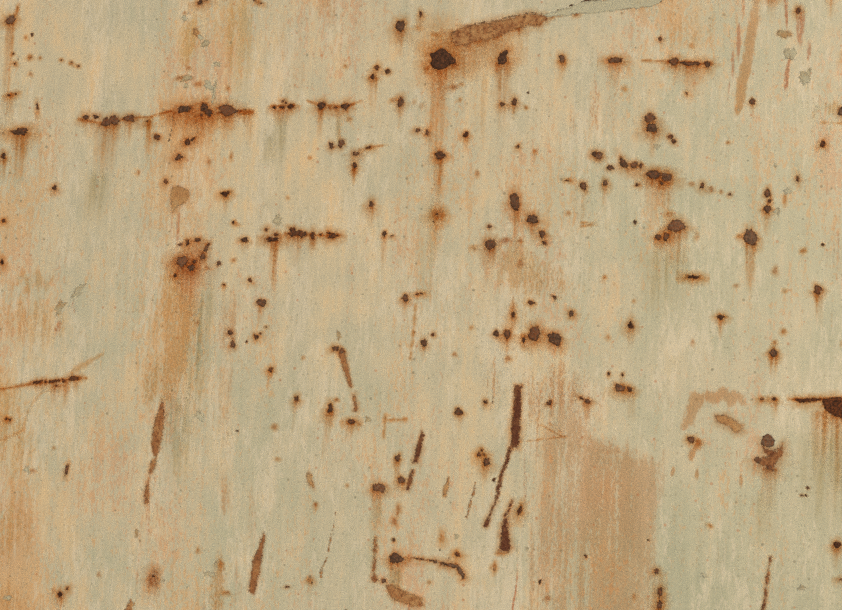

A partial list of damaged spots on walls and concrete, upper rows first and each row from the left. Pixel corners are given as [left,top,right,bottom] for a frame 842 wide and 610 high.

peeling [451,0,662,46]
corrosion [430,48,456,70]
corrosion [83,114,134,126]
corrosion [178,103,239,117]
corrosion [607,157,672,185]
corrosion [174,238,210,277]
corrosion [796,397,842,418]
corrosion [389,553,404,564]